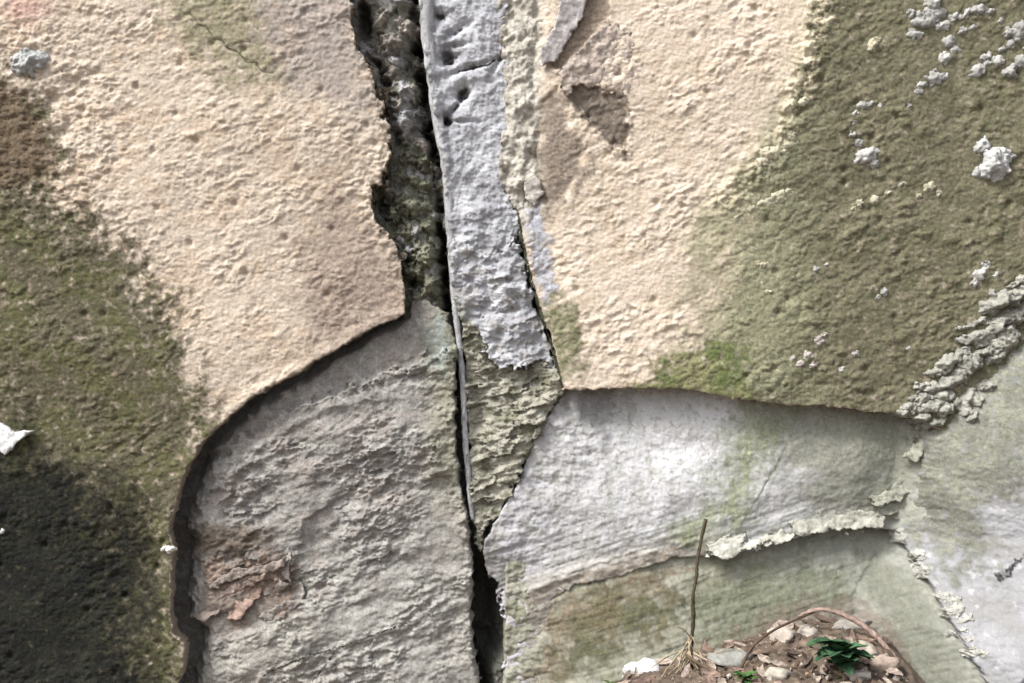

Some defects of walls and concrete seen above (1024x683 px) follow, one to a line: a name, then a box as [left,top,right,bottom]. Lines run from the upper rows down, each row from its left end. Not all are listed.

leakage [0,81,56,186]
crack [191,15,273,74]
peeling [524,176,545,207]
peeling [522,0,637,161]
efflorescence [849,100,883,169]
efflorescence [906,0,1024,108]
efflorescence [972,135,1017,183]
crack [263,0,507,683]
crack [509,211,562,382]
efflorescence [969,260,1000,288]
spalling [160,274,1024,683]
leakage [0,441,165,683]